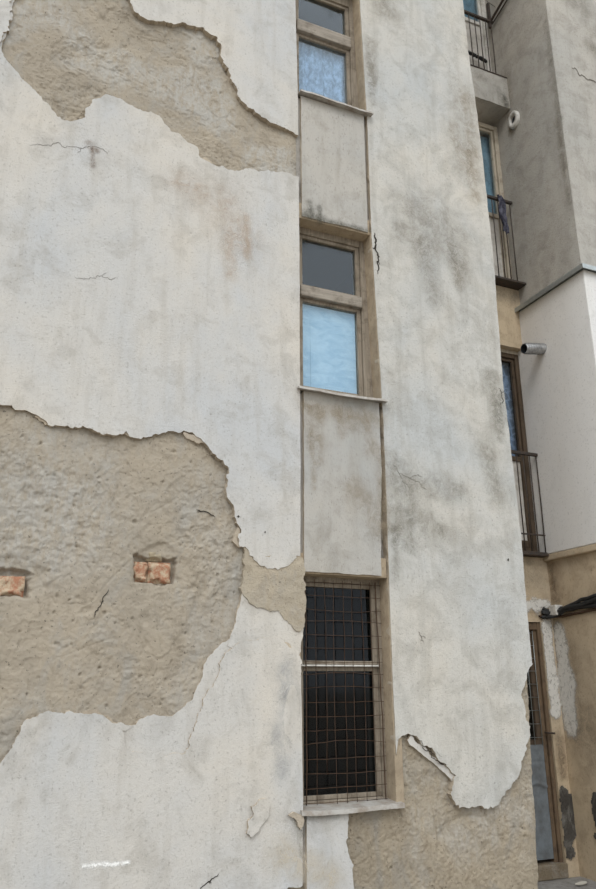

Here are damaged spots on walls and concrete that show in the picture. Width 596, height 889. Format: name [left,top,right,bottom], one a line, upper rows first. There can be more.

flaking render [0,0,296,176]
crack [372,233,380,272]
flaking render [0,406,306,763]
flaking render [521,680,530,726]
damp [553,621,578,737]
flaking render [346,734,538,889]